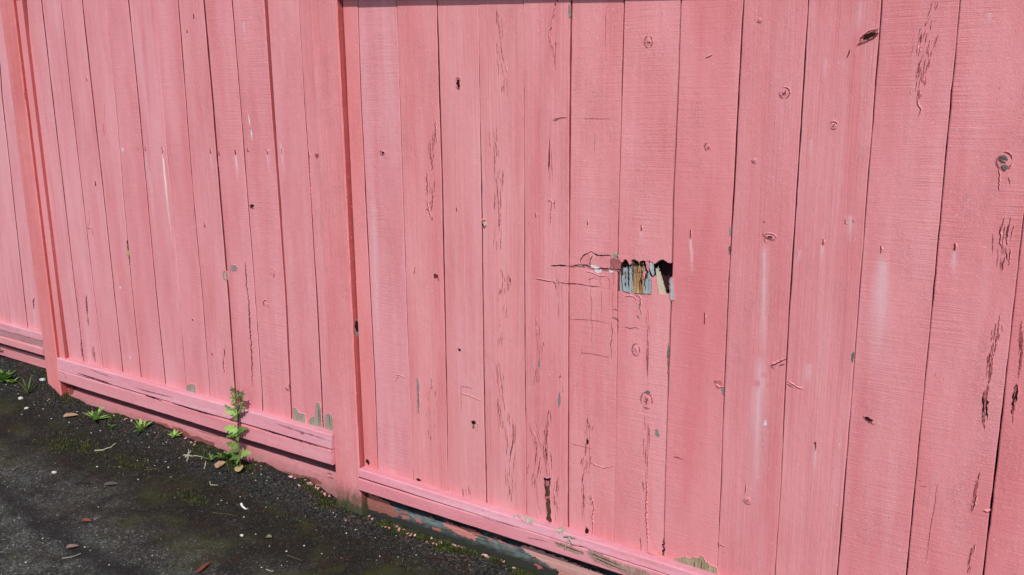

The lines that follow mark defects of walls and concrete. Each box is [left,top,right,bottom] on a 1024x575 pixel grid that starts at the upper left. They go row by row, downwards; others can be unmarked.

crack [910,1,938,117]
spalling [579,253,676,302]
crack [992,217,1015,270]
crack [426,117,670,559]
crack [982,315,1024,431]
peeling [292,402,333,431]
peeling [367,494,651,575]
peeling [648,537,719,574]